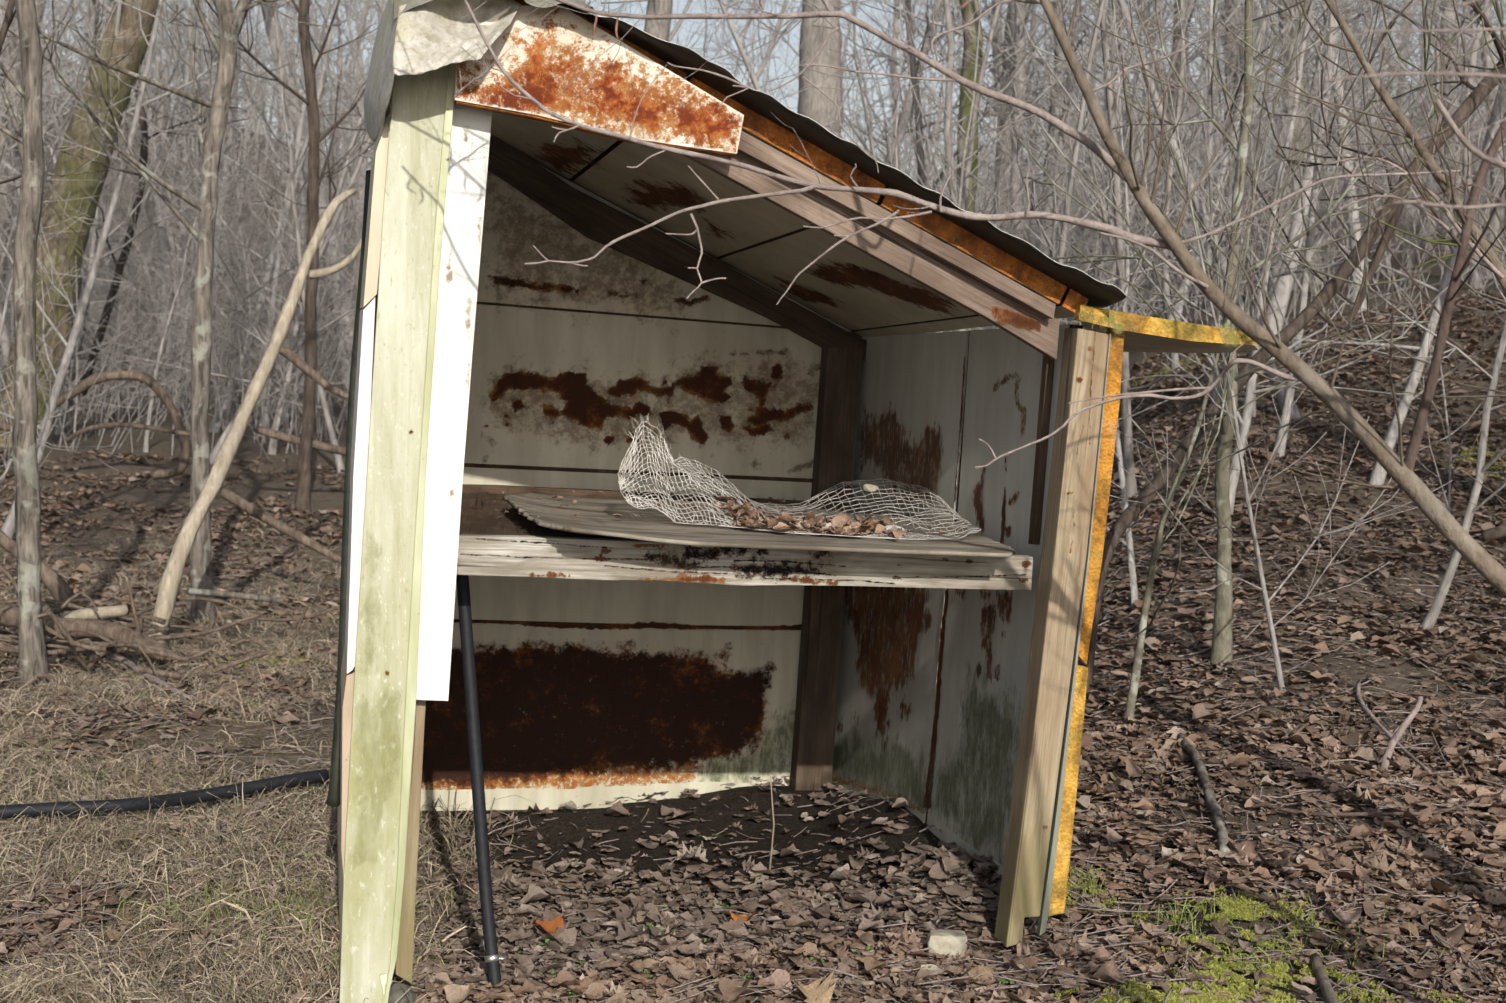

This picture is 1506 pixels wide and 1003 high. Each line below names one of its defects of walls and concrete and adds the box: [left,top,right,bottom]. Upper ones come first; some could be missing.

rust [457,9,740,176]
rust [773,259,960,318]
rust [484,349,814,461]
rust [857,358,1019,544]
rust [993,374,1026,435]
rust [421,620,802,790]
rust [832,586,1012,813]